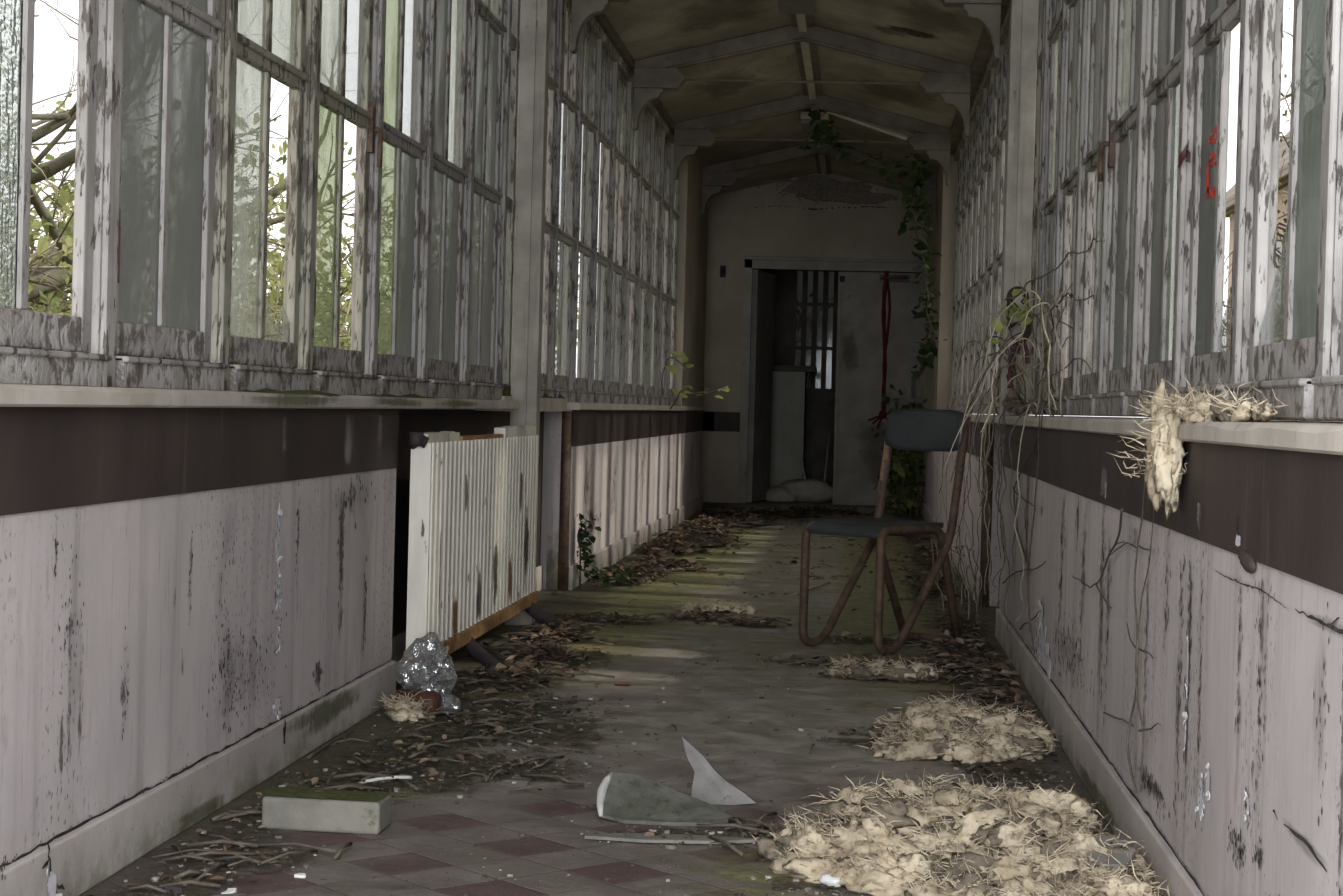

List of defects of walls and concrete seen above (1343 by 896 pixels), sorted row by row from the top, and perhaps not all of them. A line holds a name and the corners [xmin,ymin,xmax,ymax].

leakage [54,538,84,666]
leakage [60,685,83,772]
leakage [202,527,275,733]
leakage [324,474,376,630]
leakage [1053,495,1111,726]
leakage [1135,560,1203,820]
leakage [1238,582,1269,783]
leakage [1227,804,1280,896]
crack [1216,571,1343,634]
crack [1273,810,1327,872]
leakage [1313,670,1343,894]